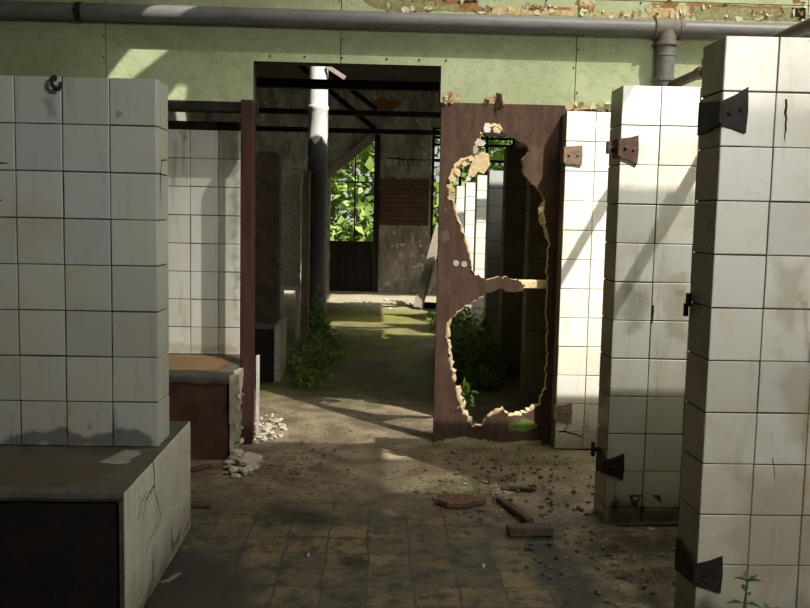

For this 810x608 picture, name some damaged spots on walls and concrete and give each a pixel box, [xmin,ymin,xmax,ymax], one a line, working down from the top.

peeling [364,0,808,23]
peeling [447,123,502,200]
crack [138,460,164,556]